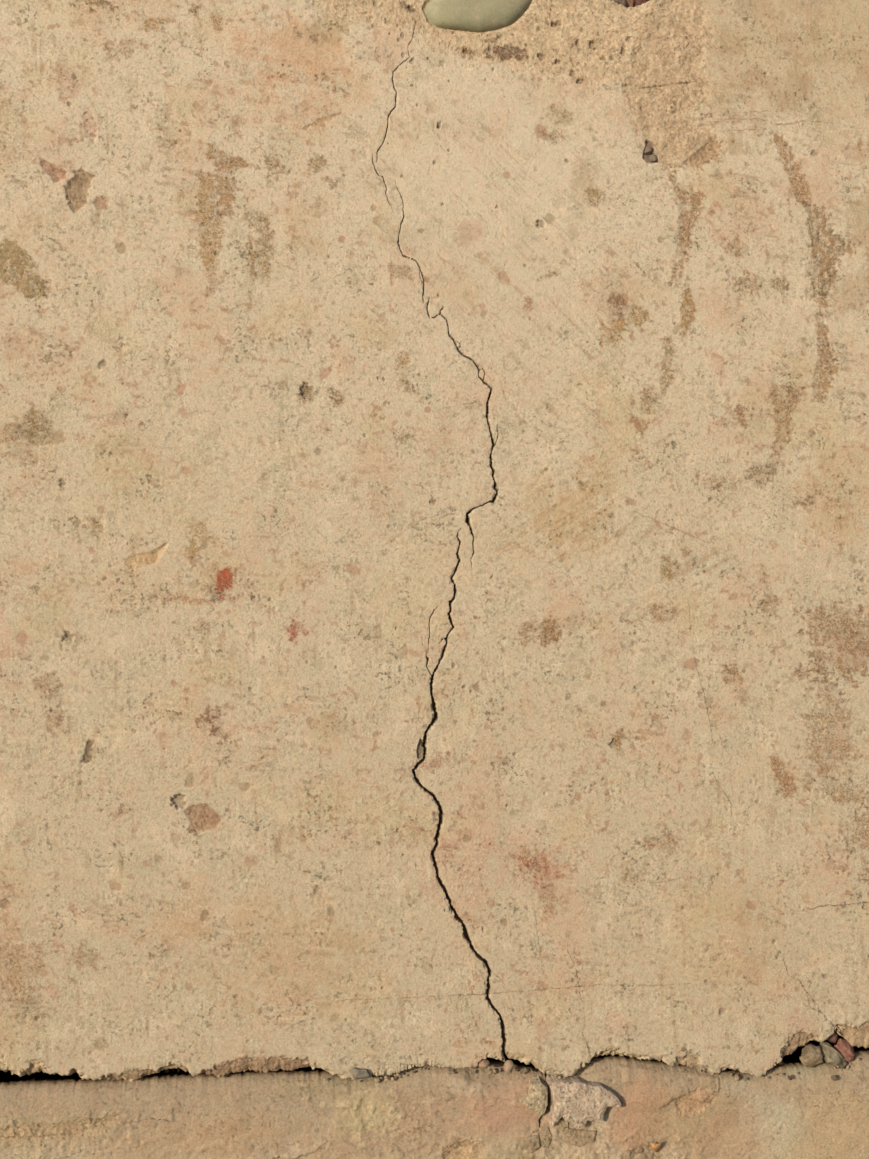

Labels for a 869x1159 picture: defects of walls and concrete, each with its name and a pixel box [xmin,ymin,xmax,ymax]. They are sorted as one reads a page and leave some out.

crack [372,22,508,1059]
spalling [0,1055,51,1075]
spalling [102,1052,320,1082]
spalling [670,1049,722,1118]
spalling [773,1028,821,1066]
spalling [834,1021,869,1049]
flaking render [519,1064,622,1159]